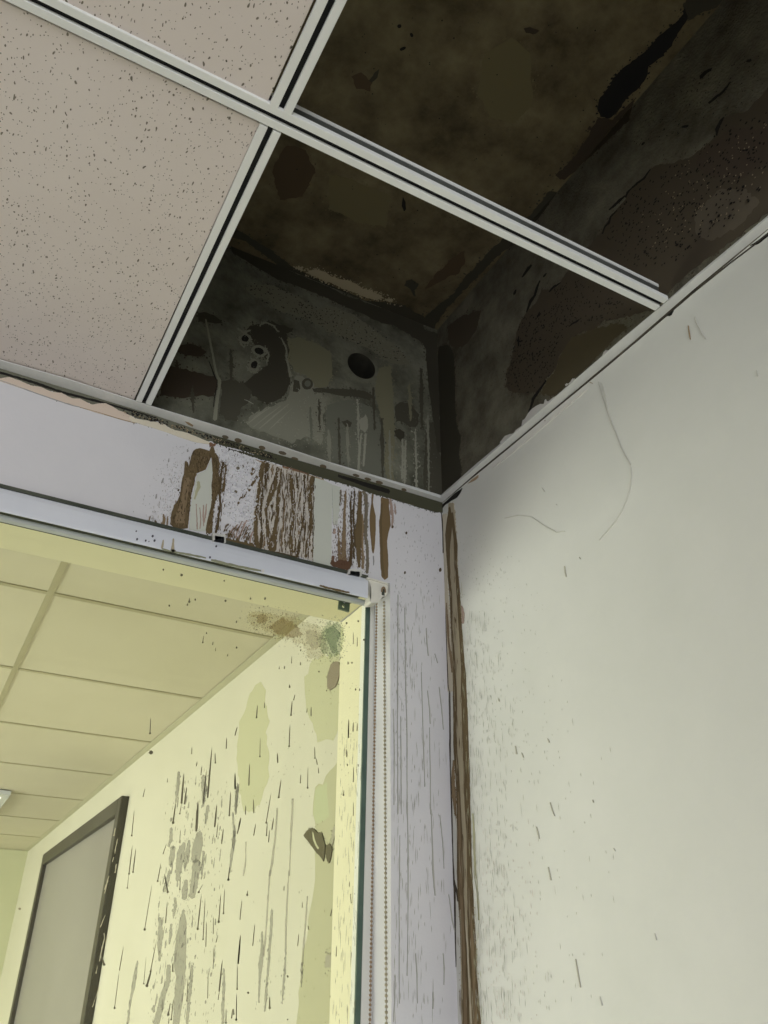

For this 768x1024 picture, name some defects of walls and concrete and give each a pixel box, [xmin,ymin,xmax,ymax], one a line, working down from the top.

damp [472,27,539,126]
damp [525,0,722,222]
damp [537,317,633,399]
damp [157,228,560,1024]
spalling [304,828,333,863]